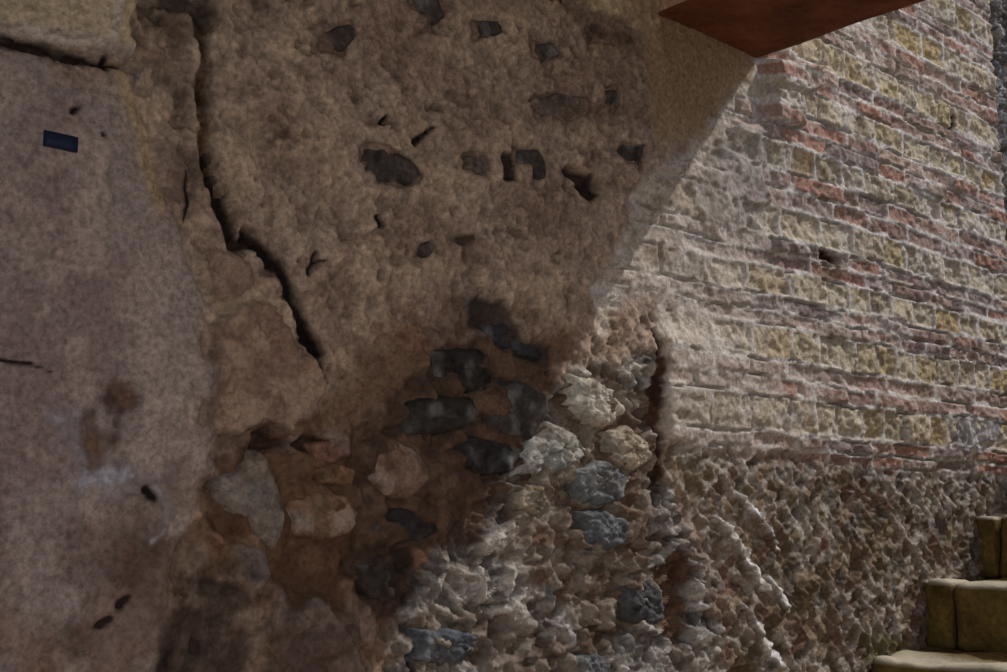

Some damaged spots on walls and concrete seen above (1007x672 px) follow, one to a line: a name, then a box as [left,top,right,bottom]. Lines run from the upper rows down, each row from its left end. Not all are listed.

crack [182,153,323,371]
spalling [204,298,692,672]
flaking render [954,412,1002,455]